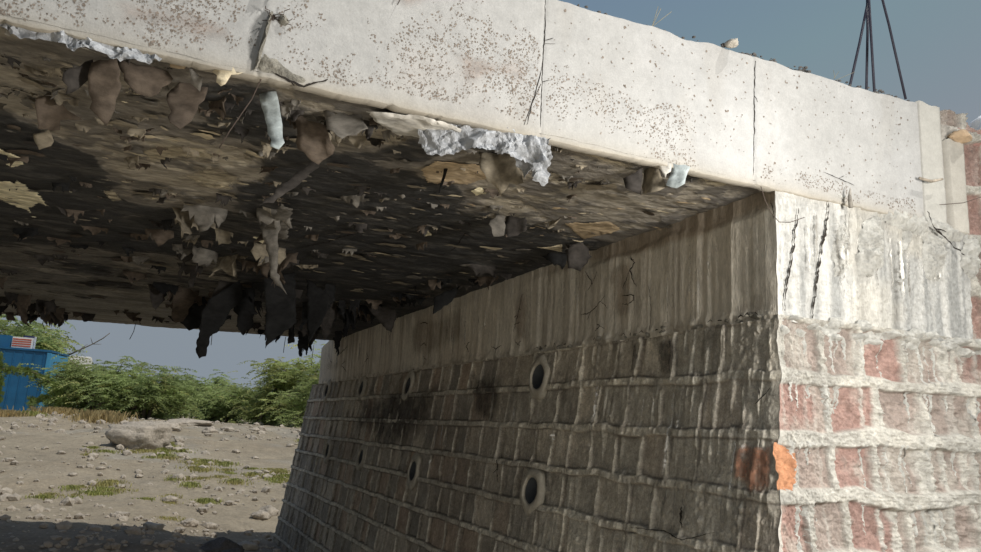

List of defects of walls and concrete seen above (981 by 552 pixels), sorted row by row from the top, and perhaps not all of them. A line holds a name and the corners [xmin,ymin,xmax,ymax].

peeling [0,0,743,360]
crack [583,258,651,331]
crack [770,201,799,311]
crack [812,203,829,319]